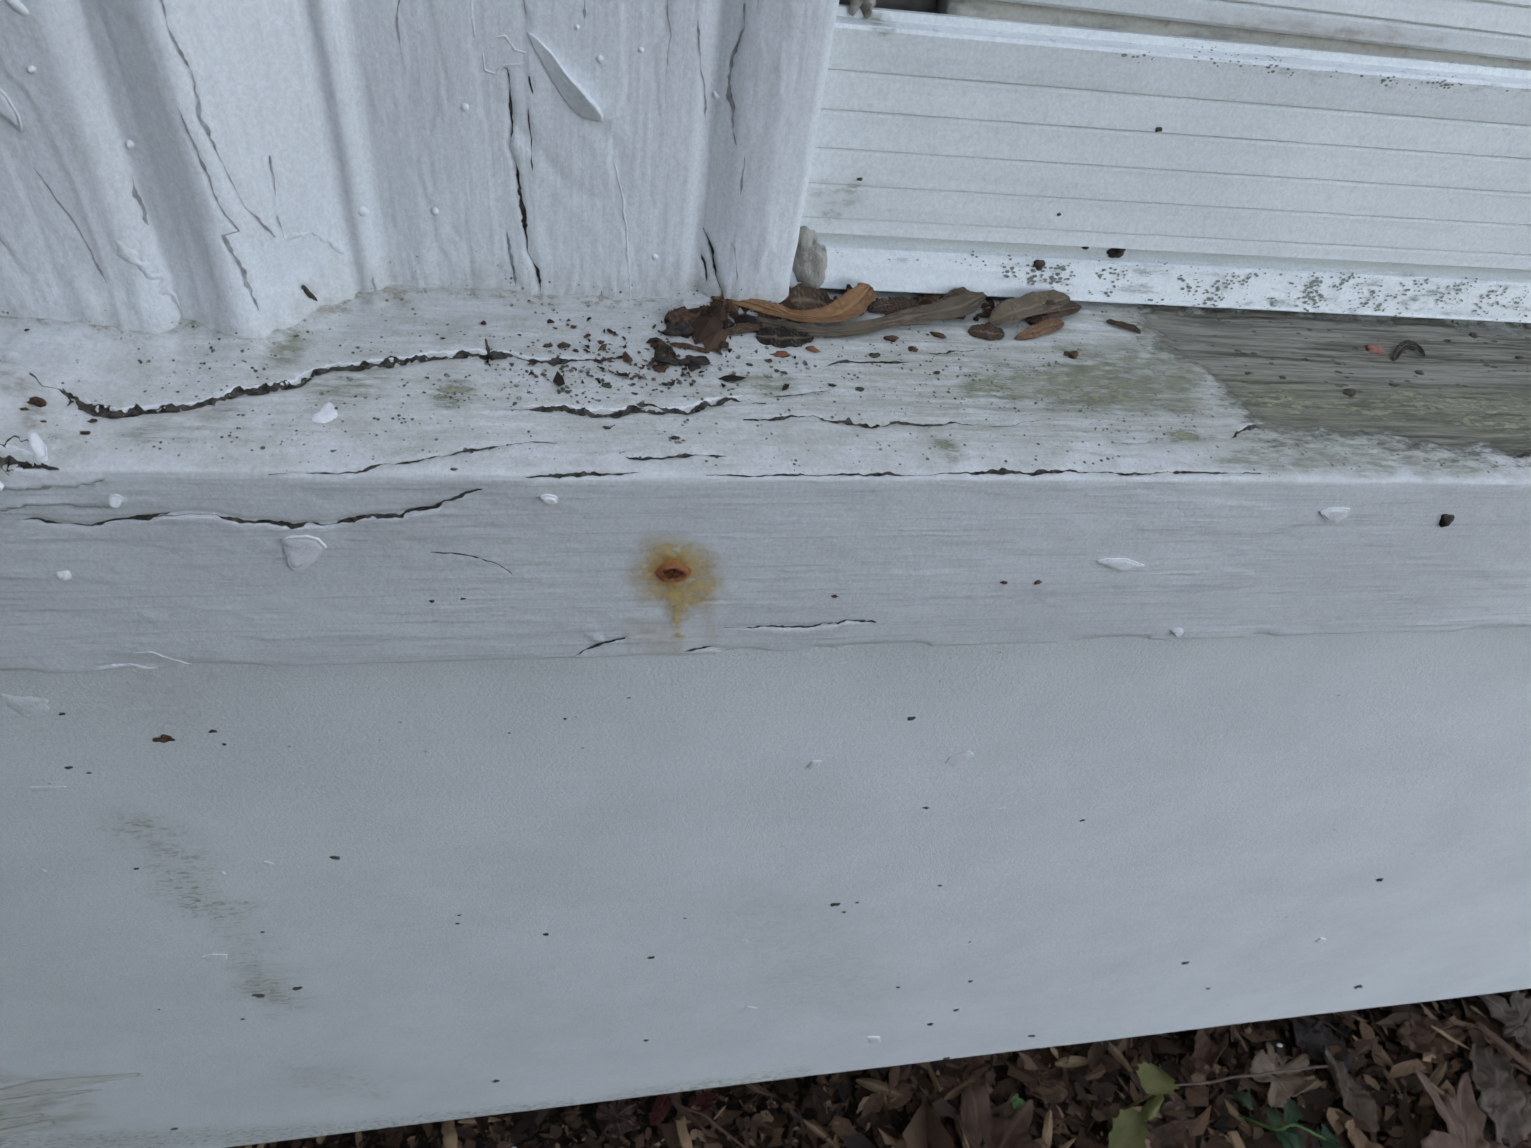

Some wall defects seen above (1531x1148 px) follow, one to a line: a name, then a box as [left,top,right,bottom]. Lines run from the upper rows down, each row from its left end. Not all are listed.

crack [33,167,108,285]
crack [131,176,148,225]
crack [504,67,542,295]
crack [701,228,738,296]
crack [2,338,623,419]
crack [268,350,1374,479]
peeling [1139,304,1531,467]
crack [24,489,482,531]
crack [434,552,512,574]
rust [640,544,715,638]